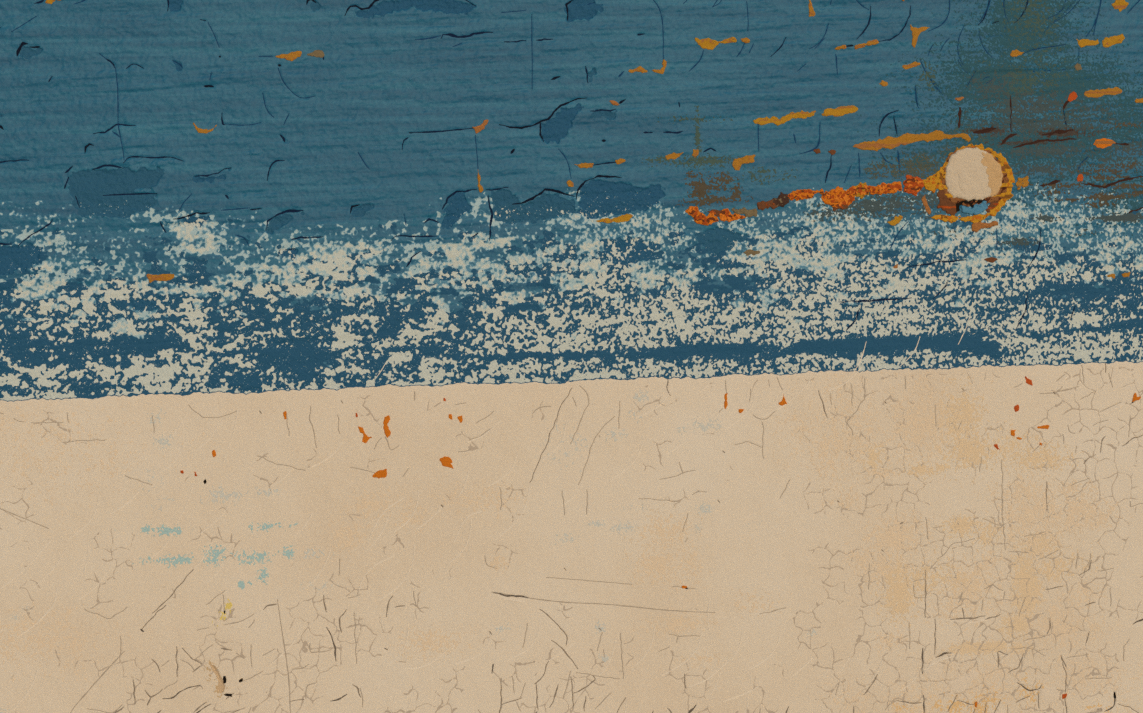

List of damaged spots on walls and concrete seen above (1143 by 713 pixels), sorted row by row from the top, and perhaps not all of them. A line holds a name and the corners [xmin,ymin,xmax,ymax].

crack [345,0,379,15]
crack [0,0,44,56]
peeling [695,37,750,50]
peeling [1077,34,1125,48]
crack [637,0,1143,188]
peeling [1068,87,1122,102]
crack [64,53,323,256]
crack [391,0,626,267]
peeling [753,105,858,126]
rust [641,0,1143,248]
peeling [853,130,971,151]
peeling [356,413,391,443]